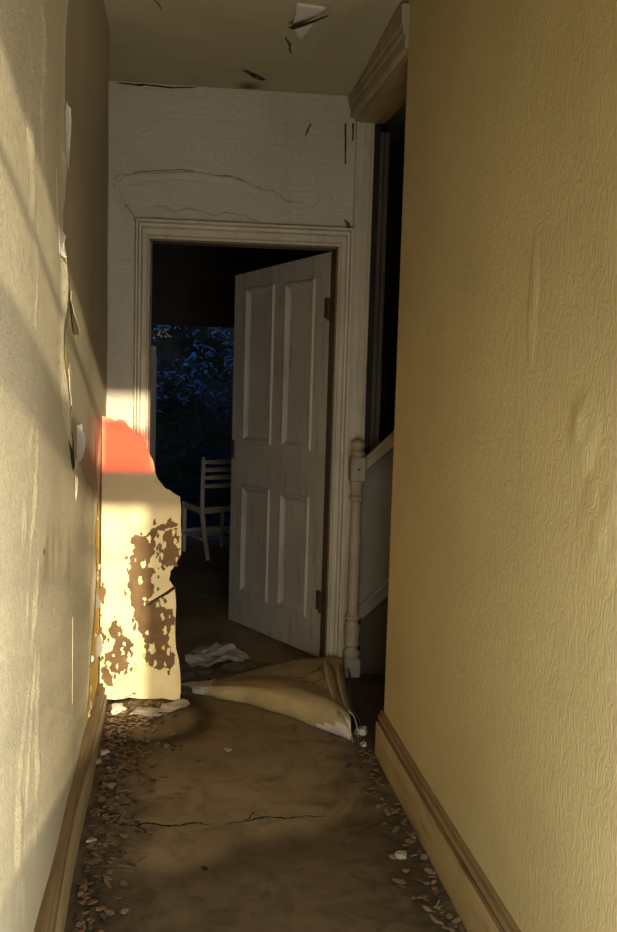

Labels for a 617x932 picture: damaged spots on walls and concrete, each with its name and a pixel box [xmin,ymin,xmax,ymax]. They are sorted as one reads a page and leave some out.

peeling [288,3,328,40]
peeling [85,444,180,728]
crack [97,811,327,836]